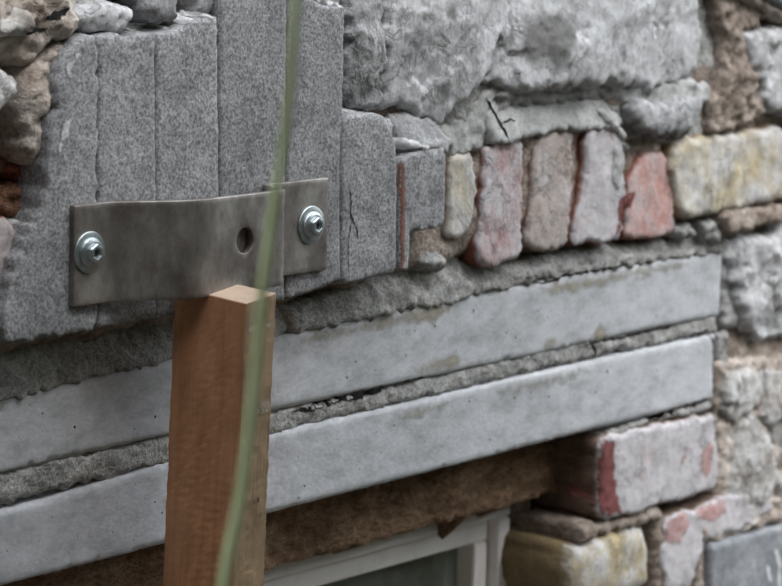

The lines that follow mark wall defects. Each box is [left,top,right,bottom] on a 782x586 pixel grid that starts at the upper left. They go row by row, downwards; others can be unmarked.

crack [487,99,515,139]